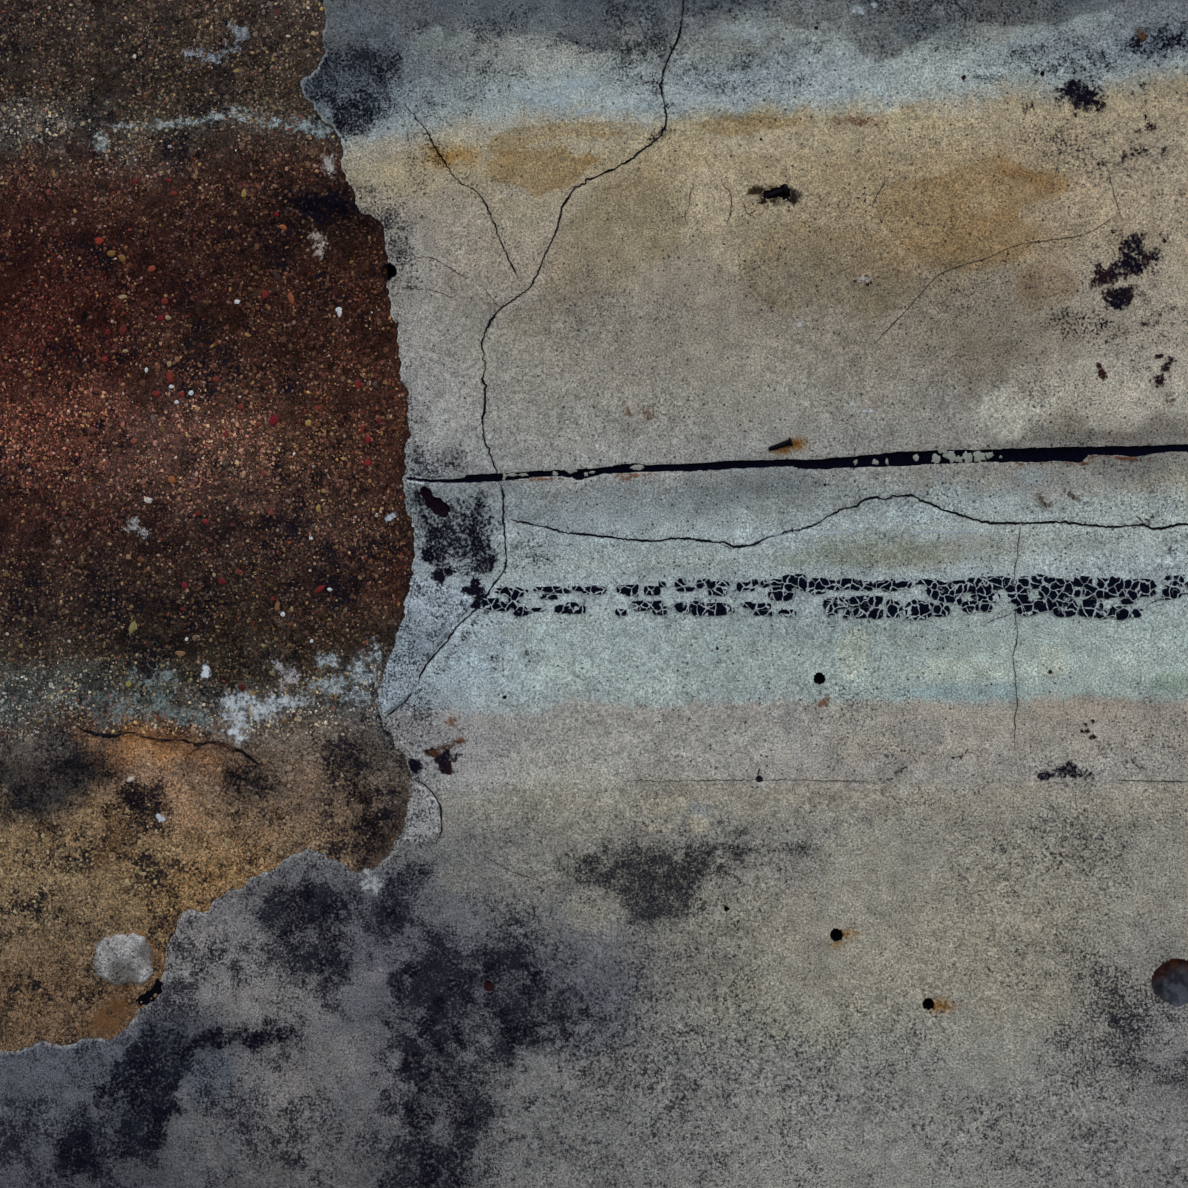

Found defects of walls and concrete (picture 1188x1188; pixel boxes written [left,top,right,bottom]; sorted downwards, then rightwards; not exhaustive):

water stain [269,28,499,149]
water stain [973,21,1188,117]
rust [747,176,813,206]
crack [384,0,1188,719]
water stain [1040,218,1178,382]
spalling [0,0,440,1051]
spalling [420,486,451,518]
water stain [406,440,558,677]
crack [983,611,1018,739]
water stain [239,775,607,1188]
spalling [1151,959,1188,1007]
water stain [44,1011,314,1188]